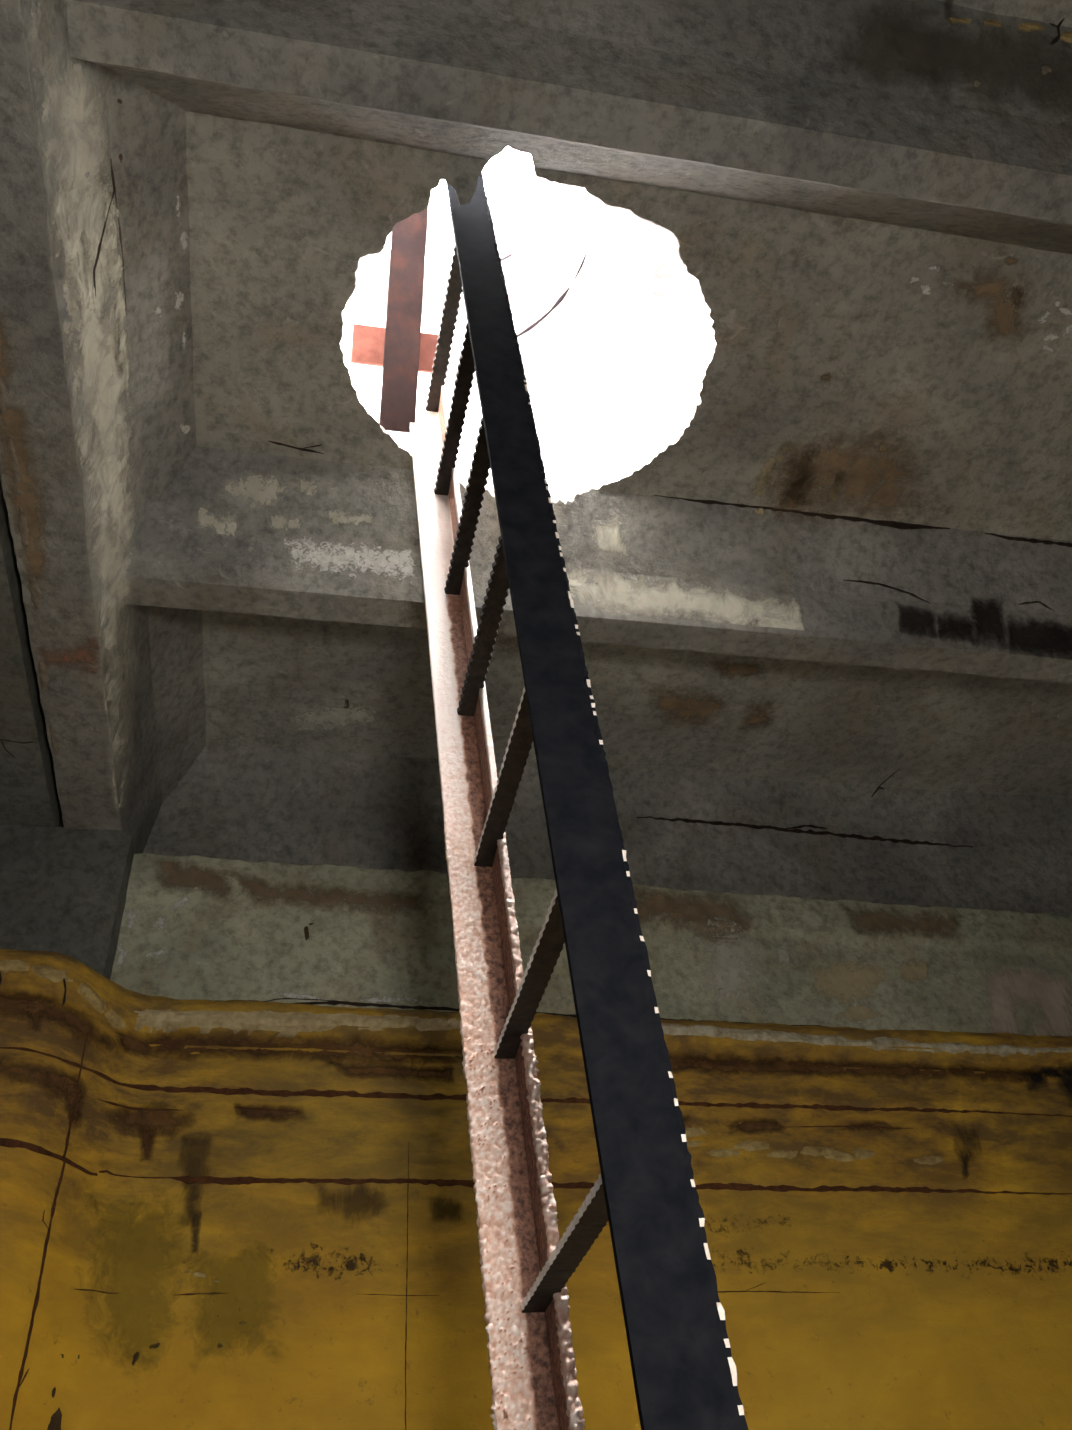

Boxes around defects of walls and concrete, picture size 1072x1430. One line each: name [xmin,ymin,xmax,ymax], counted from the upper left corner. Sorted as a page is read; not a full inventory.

leakage [899,599,1072,660]
crack [637,816,973,848]
crack [60,979,68,1006]
crack [214,998,459,1011]
crack [536,1010,576,1018]
crack [541,1096,590,1104]
crack [678,1101,1072,1129]
crack [551,1181,594,1189]
crack [695,1183,1072,1195]
leakage [110,1105,268,1353]
crack [0,1034,475,1430]
leakage [94,1204,174,1362]